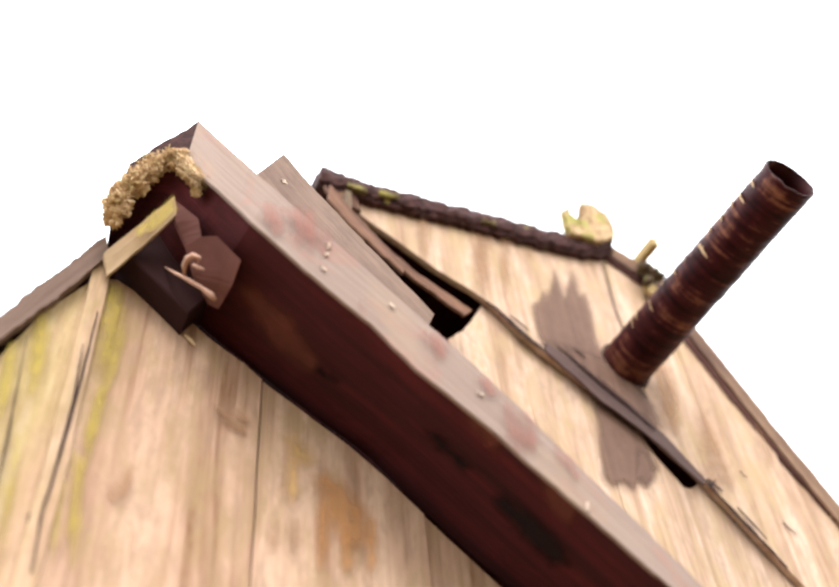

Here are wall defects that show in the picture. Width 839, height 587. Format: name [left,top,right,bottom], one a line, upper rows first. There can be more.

crack [30,311,98,572]